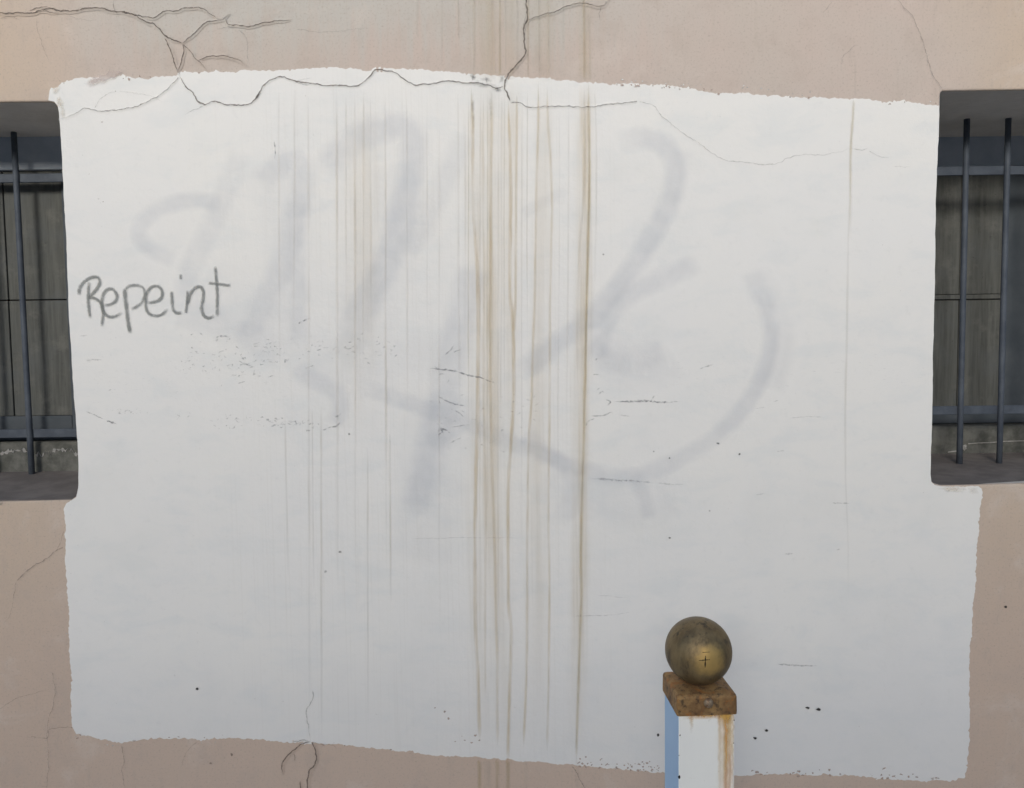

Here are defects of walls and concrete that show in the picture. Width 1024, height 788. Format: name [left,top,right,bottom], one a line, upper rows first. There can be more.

crack [0,0,637,120]
crack [279,737,319,788]